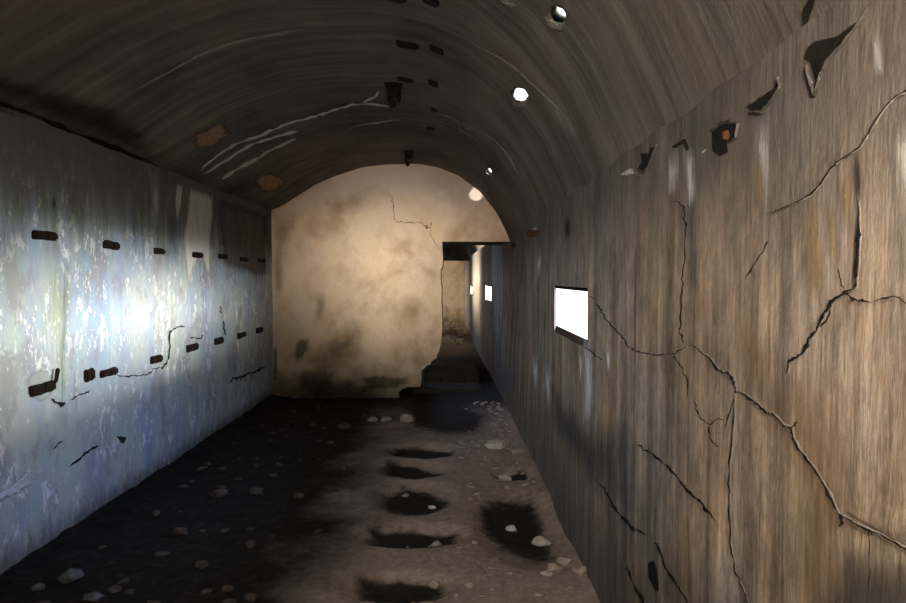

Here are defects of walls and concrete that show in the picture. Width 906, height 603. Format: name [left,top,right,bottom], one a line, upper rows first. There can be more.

spalling [803,0,815,24]
spalling [804,2,873,97]
leakage [0,81,141,147]
spalling [746,76,782,114]
spalling [621,144,657,175]
spalling [702,118,739,156]
crack [767,90,906,215]
crack [116,306,226,378]
crack [227,366,266,384]
crack [51,390,90,407]
crack [587,201,906,603]
crack [53,441,100,467]